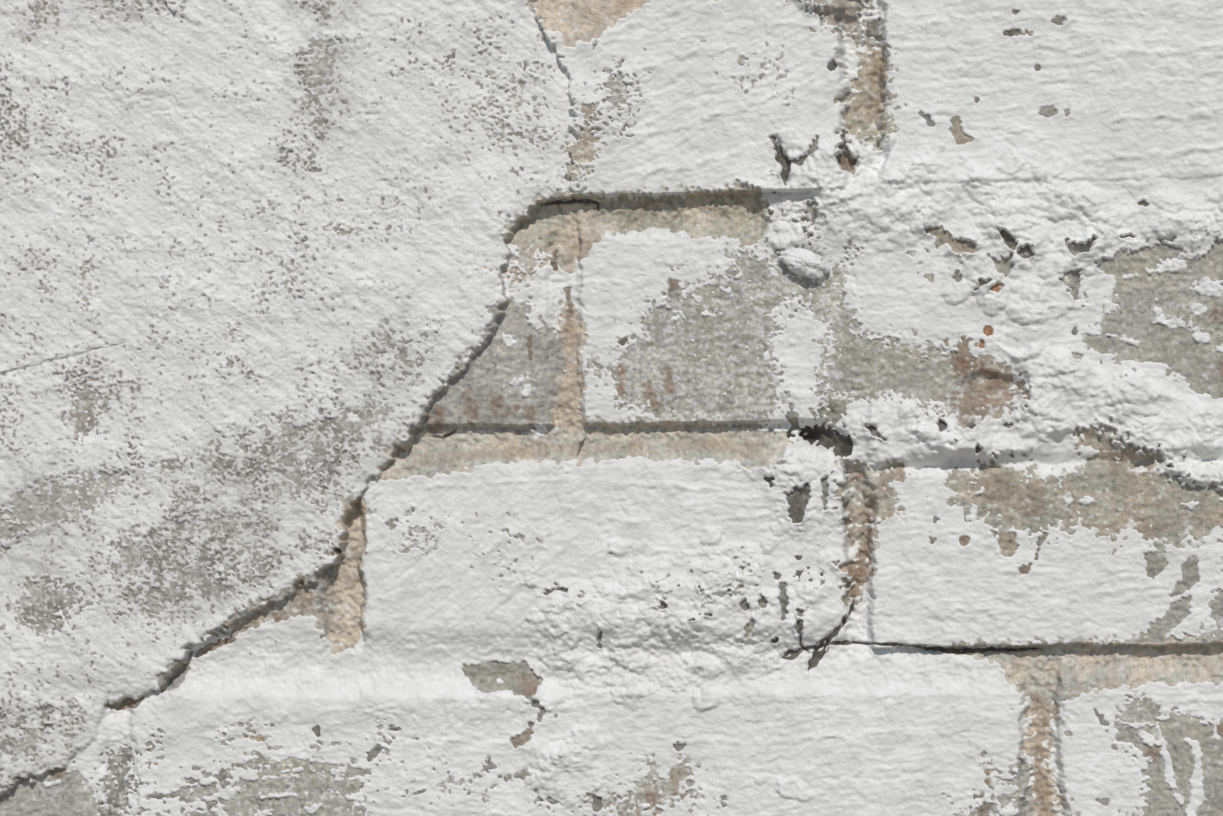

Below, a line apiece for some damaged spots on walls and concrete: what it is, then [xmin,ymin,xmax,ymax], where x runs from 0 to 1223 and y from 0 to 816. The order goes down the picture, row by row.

peeling [421,45,652,188]
spalling [712,0,881,107]
peeling [1059,270,1088,308]
peeling [1065,234,1223,399]
peeling [0,193,1034,692]
peeling [944,418,1223,644]
crack [781,598,1041,671]
peeling [0,694,558,816]
peeling [572,741,728,816]
peeling [1094,690,1223,816]